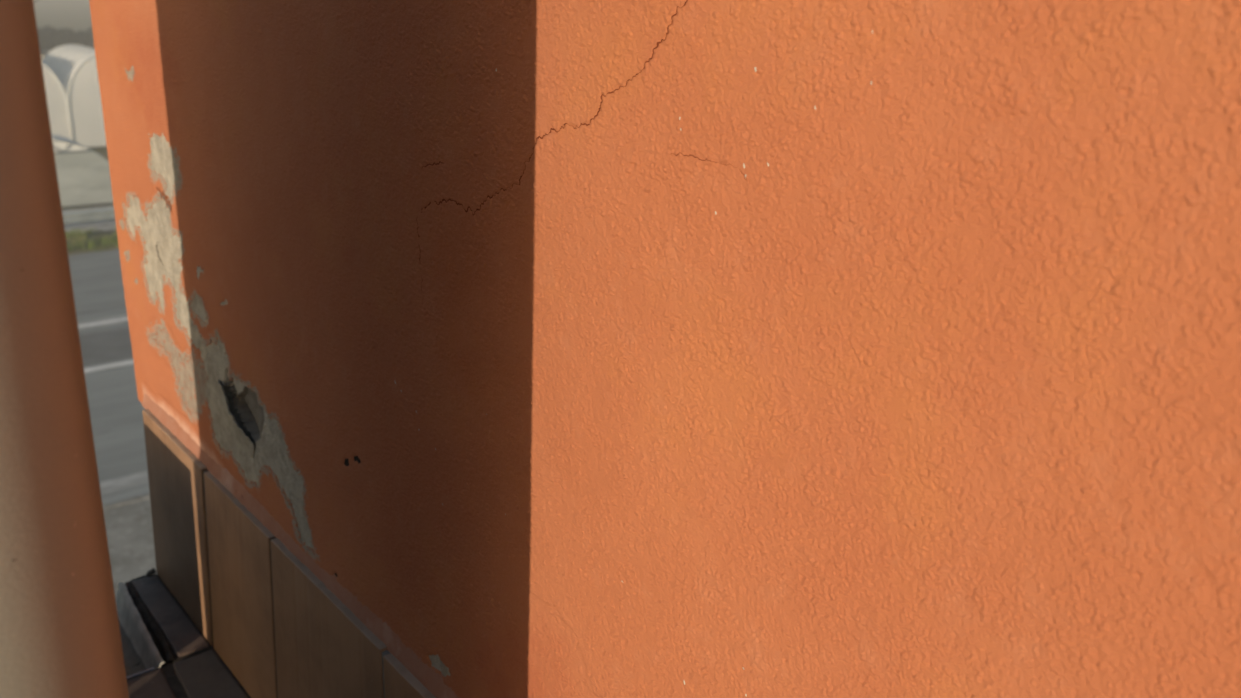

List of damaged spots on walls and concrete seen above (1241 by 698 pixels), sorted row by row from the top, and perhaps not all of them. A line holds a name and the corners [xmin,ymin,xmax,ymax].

spalling [119,132,337,577]
crack [416,0,687,304]